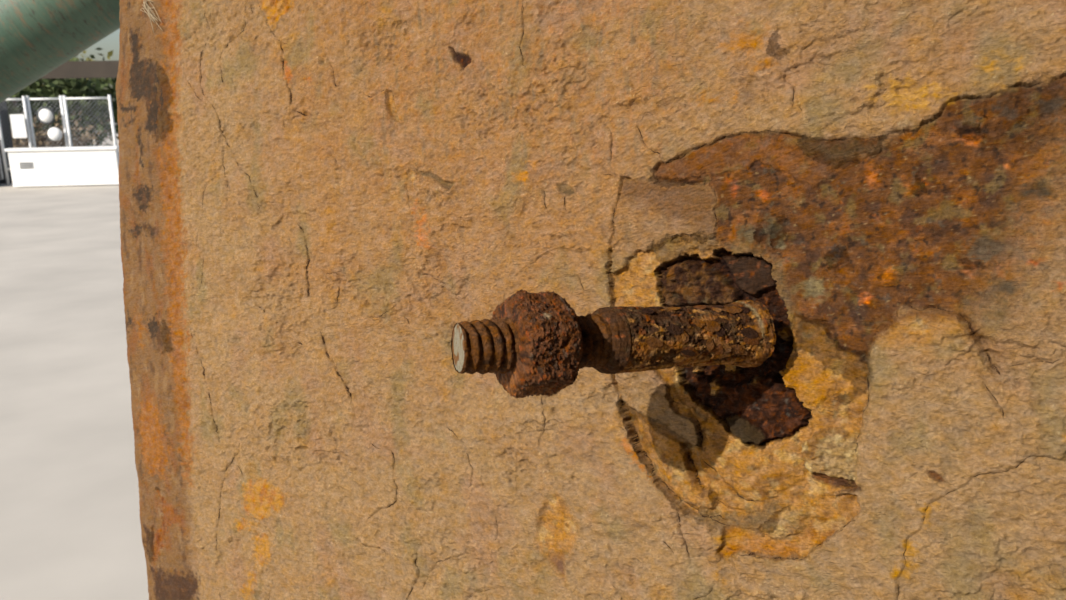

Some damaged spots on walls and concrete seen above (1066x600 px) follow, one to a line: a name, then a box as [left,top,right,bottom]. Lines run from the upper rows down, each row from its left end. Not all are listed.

corrosion [127,0,202,569]
crack [297,331,351,397]
spalling [602,68,1066,567]
corrosion [846,26,1042,137]